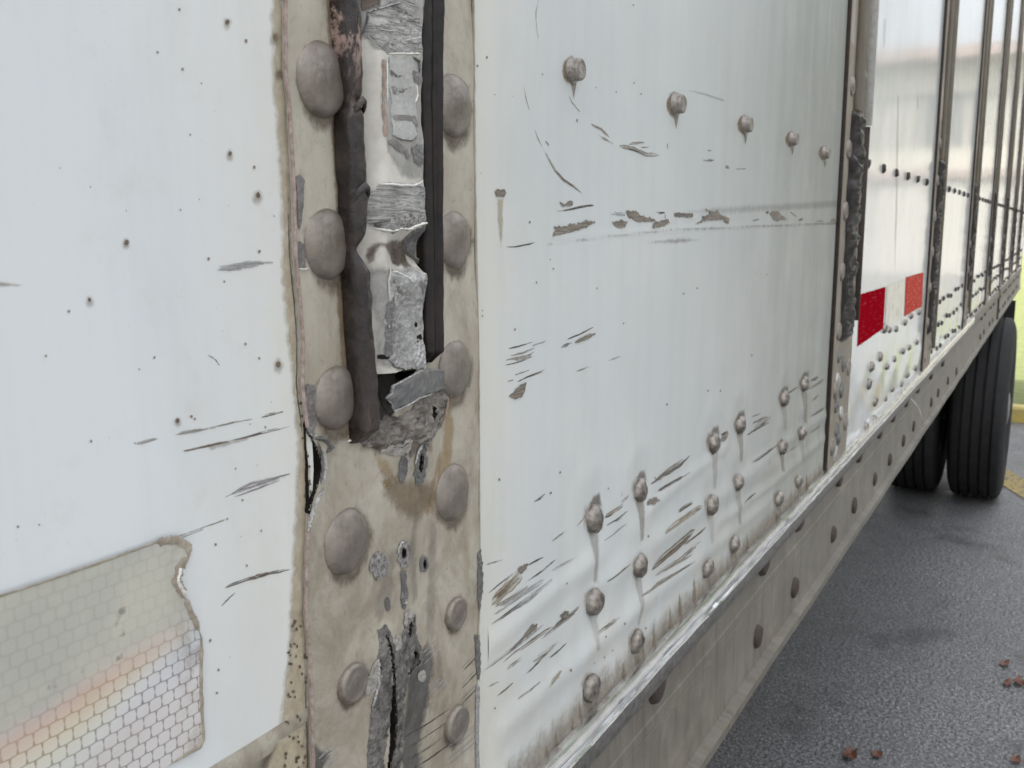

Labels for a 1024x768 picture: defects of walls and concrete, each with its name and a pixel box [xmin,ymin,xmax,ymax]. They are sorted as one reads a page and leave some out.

peeling [362,0,424,166]
peeling [367,180,428,234]
peeling [553,201,595,236]
peeling [612,208,730,228]
peeling [753,210,803,222]
peeling [377,268,428,370]